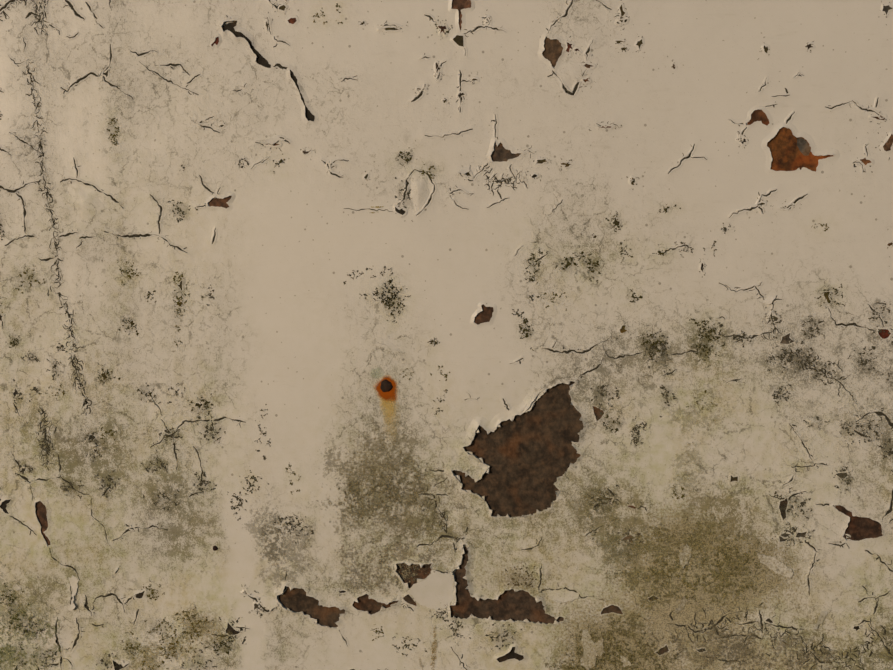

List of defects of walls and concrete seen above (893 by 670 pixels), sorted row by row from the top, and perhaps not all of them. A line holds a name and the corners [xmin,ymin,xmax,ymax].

peeling [435,0,477,50]
crack [0,0,200,416]
water stain [343,266,411,323]
rust [375,376,396,412]
peeling [443,372,608,526]
crack [662,280,893,525]
crack [0,401,168,670]
peeling [829,462,888,546]
water stain [96,607,246,670]
peeling [239,538,579,634]
water stain [545,612,682,670]
crack [665,533,893,670]